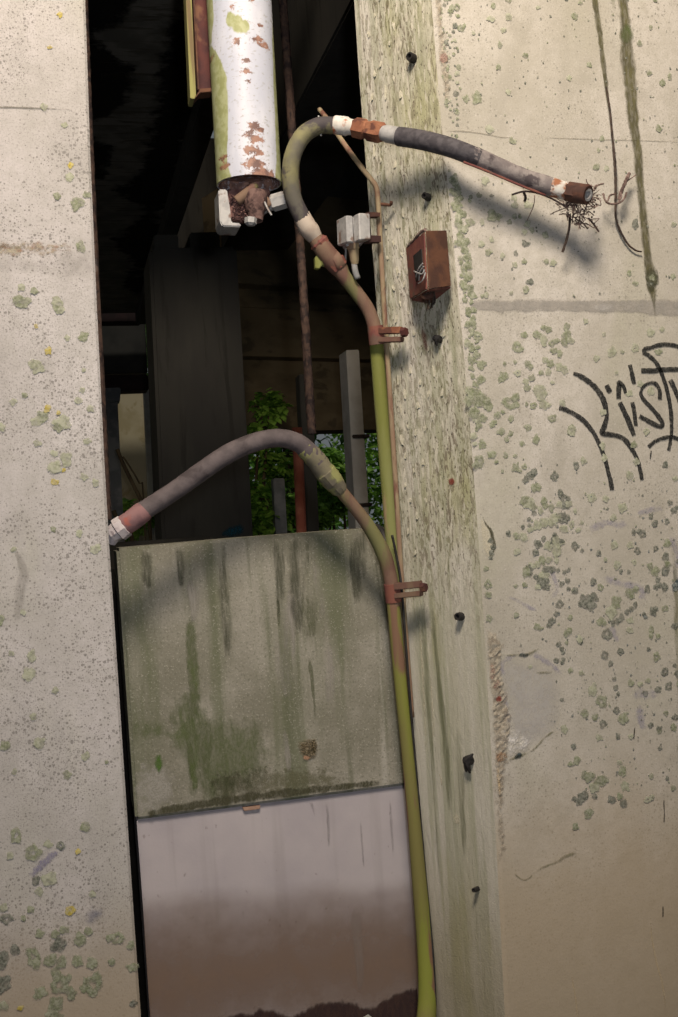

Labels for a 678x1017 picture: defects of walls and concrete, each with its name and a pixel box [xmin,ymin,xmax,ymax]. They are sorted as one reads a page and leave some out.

water stain [472,0,678,316]
water stain [177,556,198,714]
water stain [274,542,315,648]